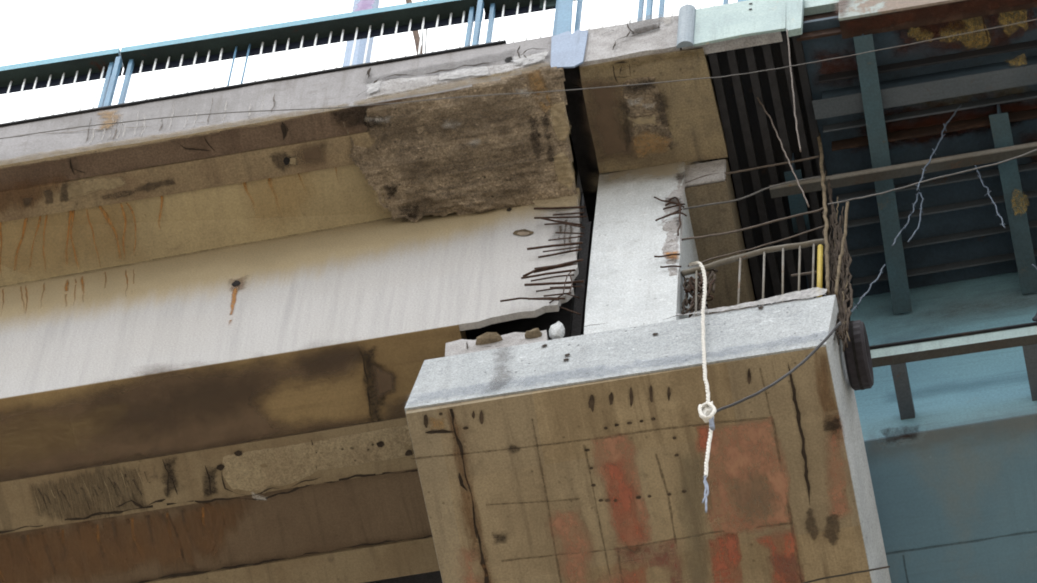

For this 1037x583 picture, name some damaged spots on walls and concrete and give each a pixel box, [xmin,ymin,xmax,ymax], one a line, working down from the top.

corrosion [846,0,1037,51]
peeling [908,17,991,48]
peeling [998,9,1029,35]
spalling [621,77,673,157]
corrosion [884,87,1037,142]
spalling [343,51,587,315]
spalling [654,172,687,278]
damp [0,349,406,517]
spalling [216,425,414,500]
crack [425,409,491,583]
crack [788,364,818,539]